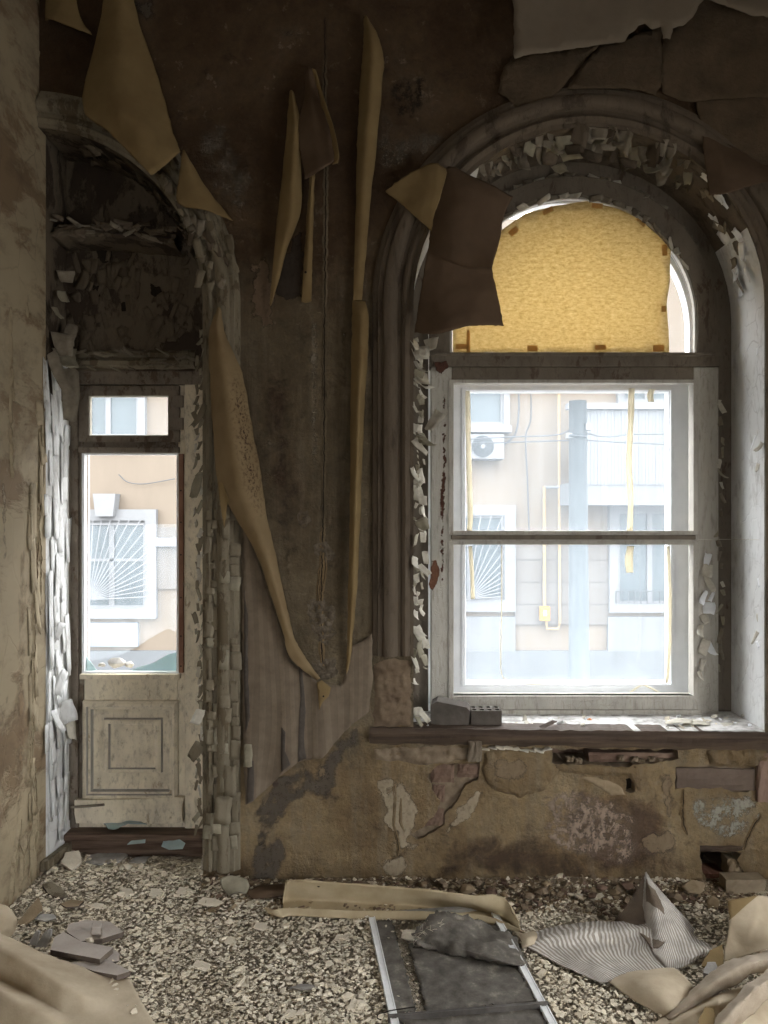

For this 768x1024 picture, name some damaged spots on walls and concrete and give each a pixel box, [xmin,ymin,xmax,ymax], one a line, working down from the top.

peeling [50,153,239,292]
peeling [275,232,304,300]
peeling [479,122,751,298]
peeling [27,270,80,884]
peeling [188,329,253,851]
peeling [372,337,447,727]
peeling [697,400,729,681]
flaking render [252,729,358,880]
flaking render [377,778,418,877]
spalling [374,746,468,765]
water stain [443,795,671,876]
spalling [552,748,768,817]